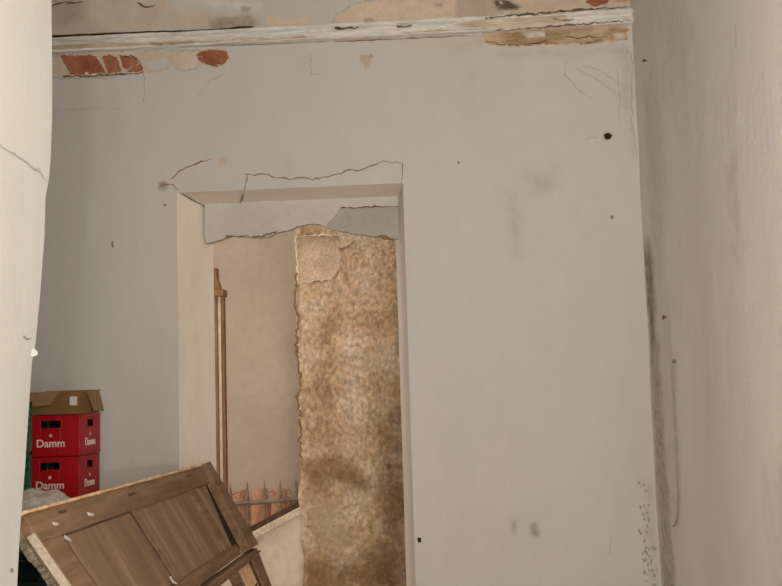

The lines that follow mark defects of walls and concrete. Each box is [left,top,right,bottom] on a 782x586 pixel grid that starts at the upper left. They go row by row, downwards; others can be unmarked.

peeling [51,0,319,81]
peeling [331,0,631,49]
crack [0,144,48,182]
crack [160,159,210,207]
crack [239,161,403,203]
flaking render [295,233,341,284]